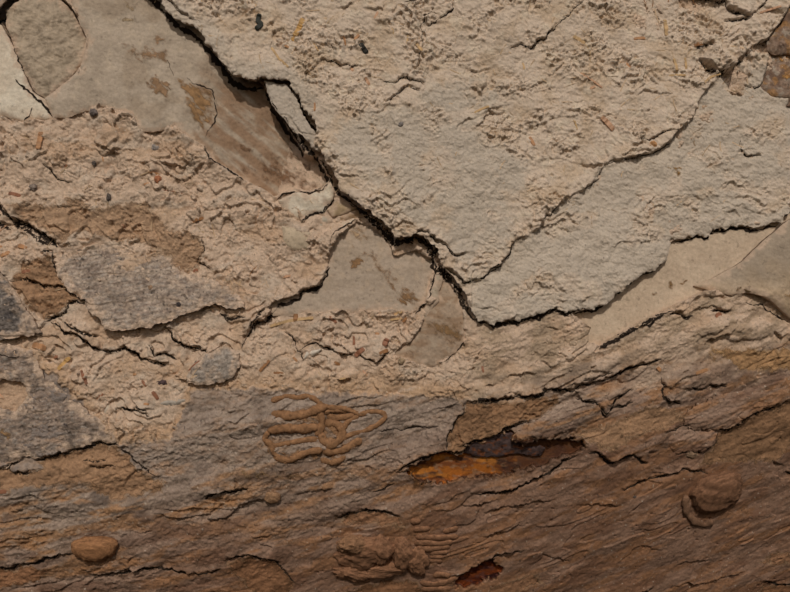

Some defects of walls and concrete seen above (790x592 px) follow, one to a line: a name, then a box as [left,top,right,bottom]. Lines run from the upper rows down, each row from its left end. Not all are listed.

crack [148,0,661,329]
flaking render [161,0,790,325]
crack [585,129,679,189]
crack [673,212,790,243]
peeling [0,197,245,499]
crack [220,267,330,347]
crack [285,332,390,362]
crack [599,302,789,349]
crack [2,441,155,476]
crack [336,359,680,518]
crack [475,401,786,495]
crack [87,555,295,583]